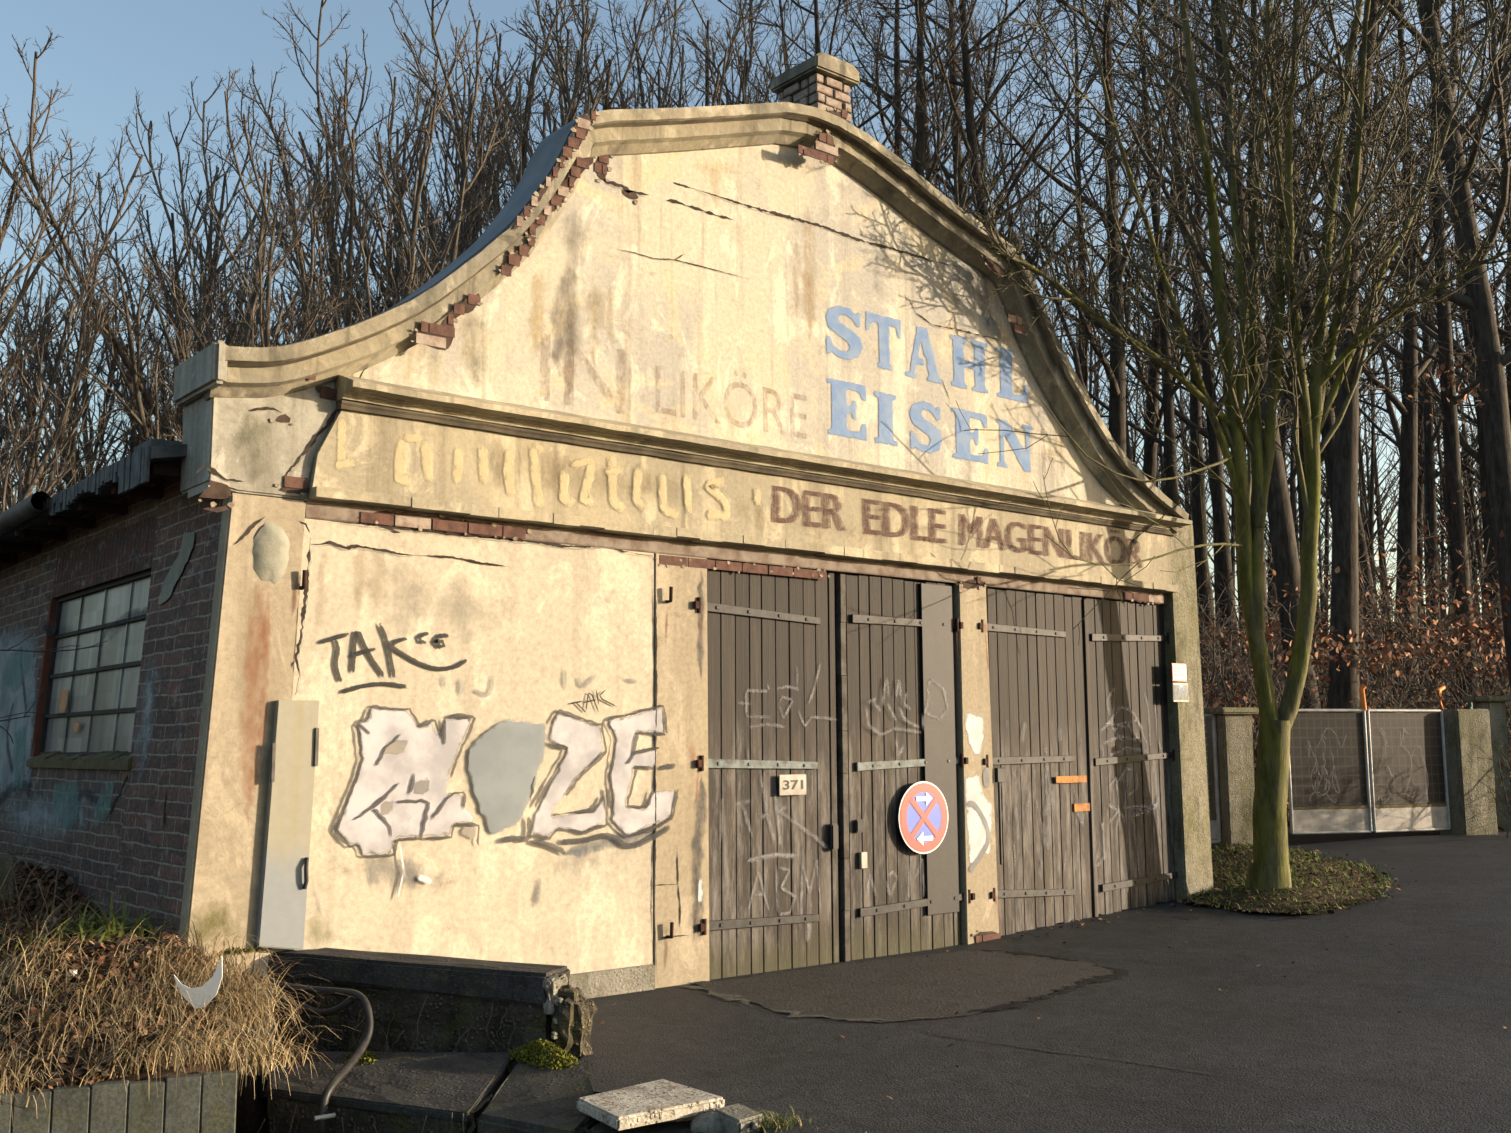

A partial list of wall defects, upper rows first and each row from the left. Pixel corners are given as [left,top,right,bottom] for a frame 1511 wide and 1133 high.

flaking render [498,110,638,277]
crack [604,180,961,270]
crack [617,249,749,280]
flaking render [410,293,483,350]
crack [908,297,998,341]
crack [196,465,243,484]
crack [249,407,339,483]
crack [234,516,688,986]